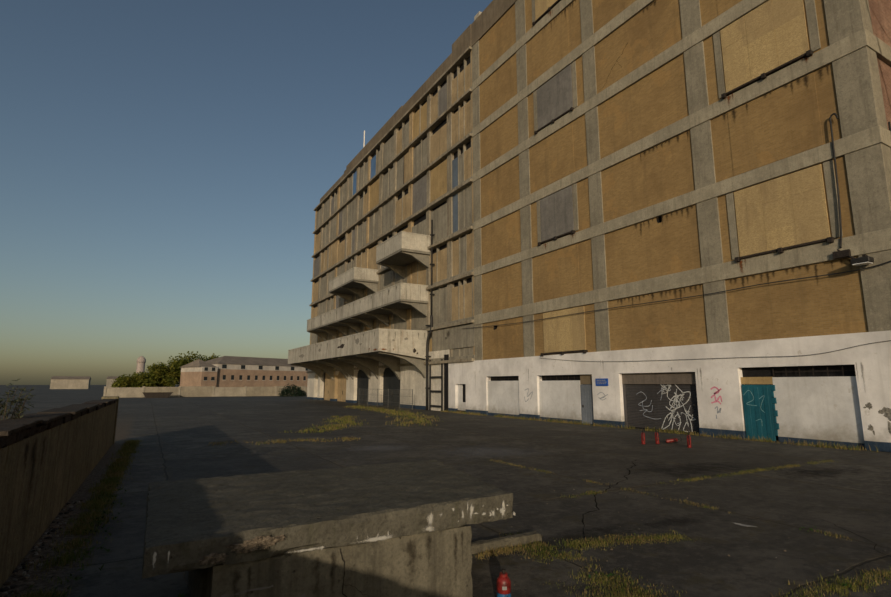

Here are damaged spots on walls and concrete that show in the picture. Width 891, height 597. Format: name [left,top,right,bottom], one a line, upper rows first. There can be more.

peeling [863,402,891,434]
peeling [452,502,515,522]